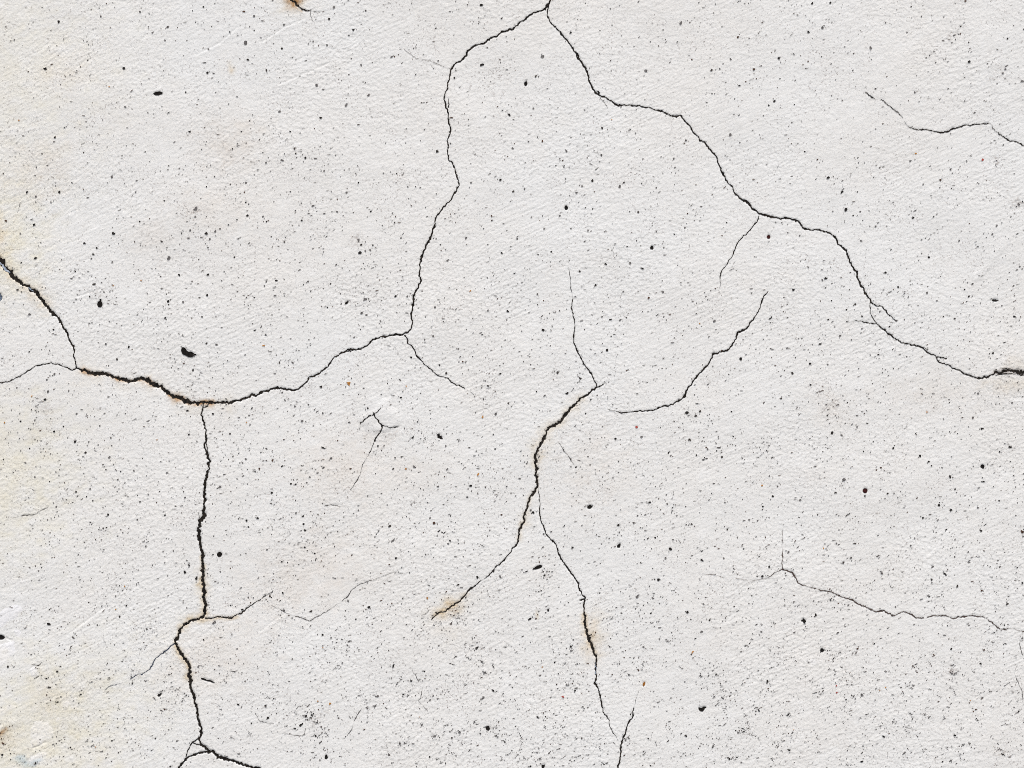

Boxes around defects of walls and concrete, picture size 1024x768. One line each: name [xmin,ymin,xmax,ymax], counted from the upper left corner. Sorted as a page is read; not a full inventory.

crack [865,92,1024,146]
crack [209,0,896,404]
crack [849,307,1024,379]
crack [0,257,254,768]
crack [325,408,397,507]
crack [431,272,768,768]
crack [205,595,266,619]
crack [698,533,1024,697]